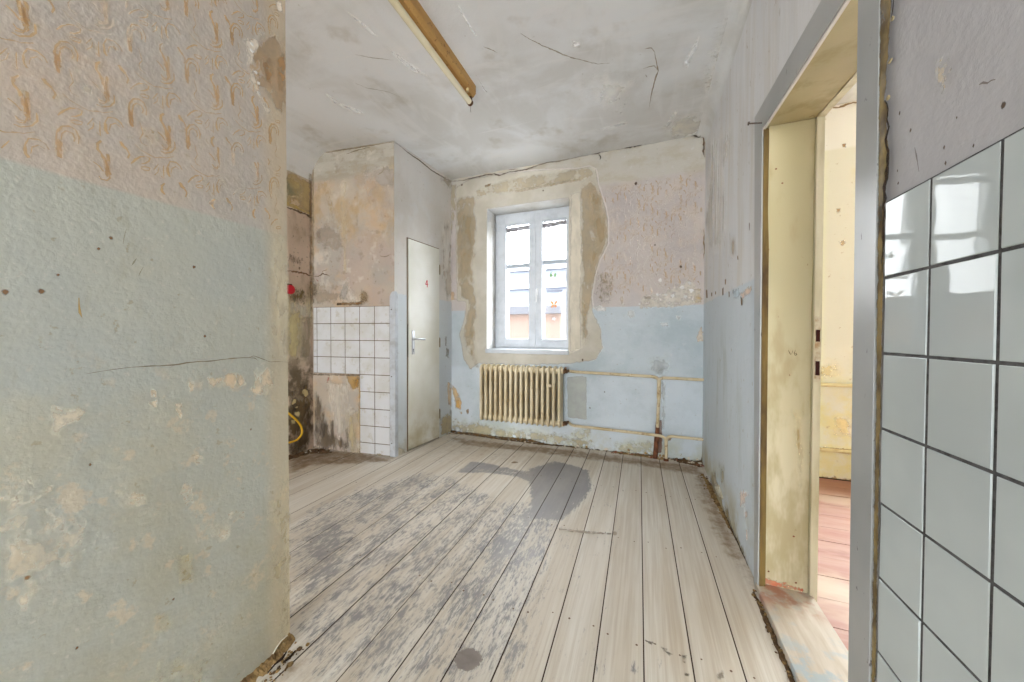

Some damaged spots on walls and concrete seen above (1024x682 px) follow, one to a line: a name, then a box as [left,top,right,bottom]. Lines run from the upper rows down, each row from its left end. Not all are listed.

peeling [246,33,270,112]
crack [522,34,605,64]
crack [643,48,659,107]
peeling [455,165,610,368]
crack [88,356,281,374]
damp [290,385,359,452]
rust [655,420,671,453]